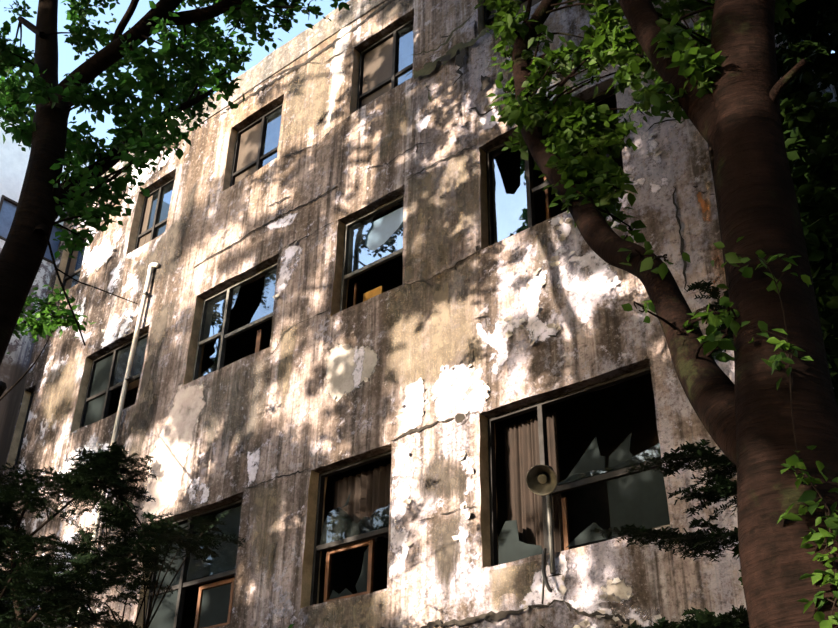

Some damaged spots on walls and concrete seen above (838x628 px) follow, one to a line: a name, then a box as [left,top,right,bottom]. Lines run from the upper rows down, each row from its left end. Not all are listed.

crack [672,186,714,291]
peeling [476,217,621,374]
spalling [325,342,379,402]
flaking render [396,364,490,432]
peeling [247,448,260,487]
peeling [389,443,413,577]
water stain [419,457,466,503]
peeling [452,452,474,545]
water stain [432,515,464,592]
crack [421,599,637,628]
flaking render [520,554,662,628]